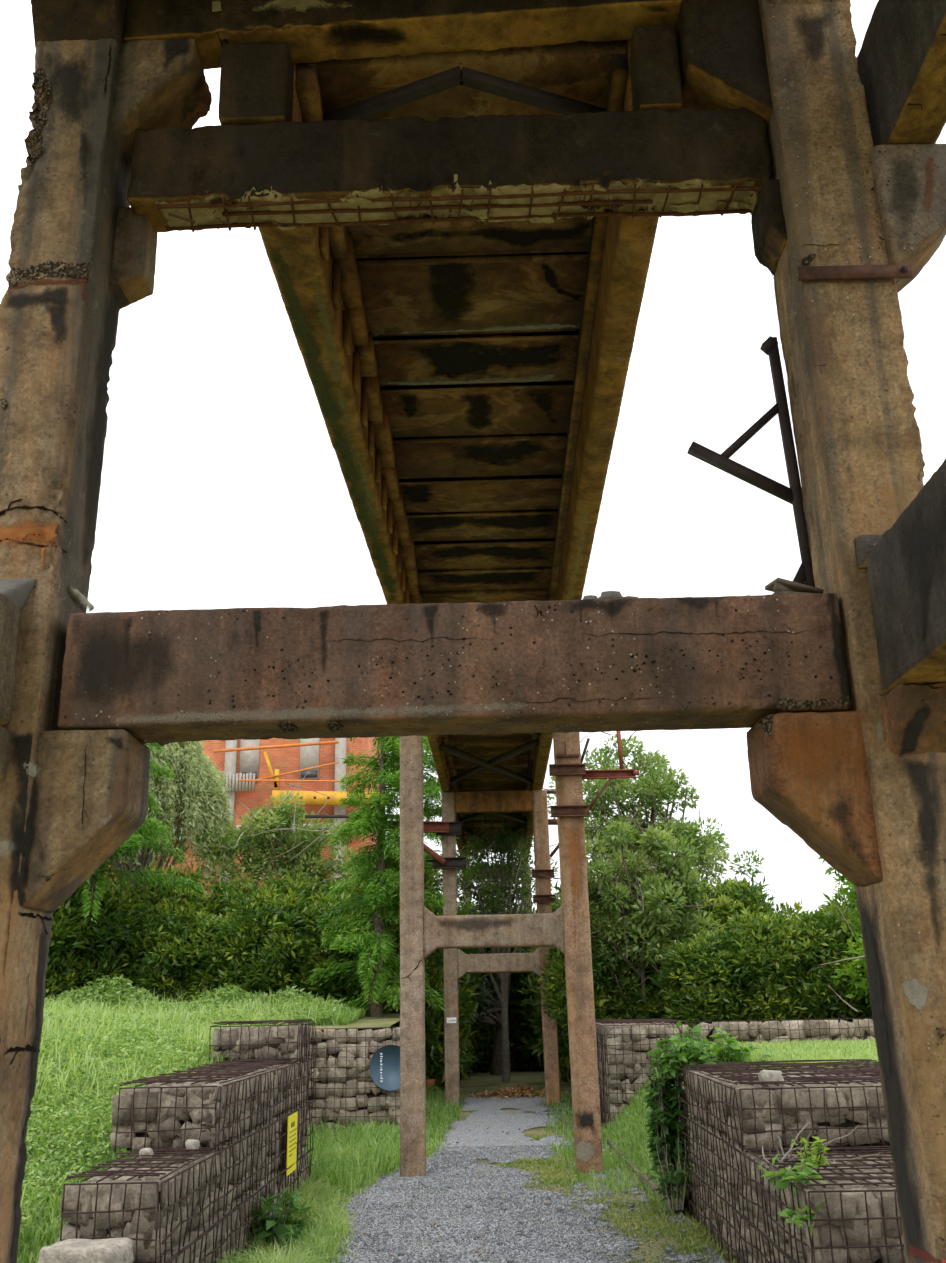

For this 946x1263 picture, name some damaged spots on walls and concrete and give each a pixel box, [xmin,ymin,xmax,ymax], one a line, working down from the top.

spalling [24,67,51,163]
spalling [155,174,761,232]
leakage [470,224,589,246]
spalling [8,261,90,287]
leakage [8,288,67,340]
leakage [401,263,574,429]
leakage [461,440,546,466]
crack [0,499,96,572]
leakage [80,619,167,698]
crack [339,636,489,644]
crack [579,624,805,636]
crack [4,973,40,1064]